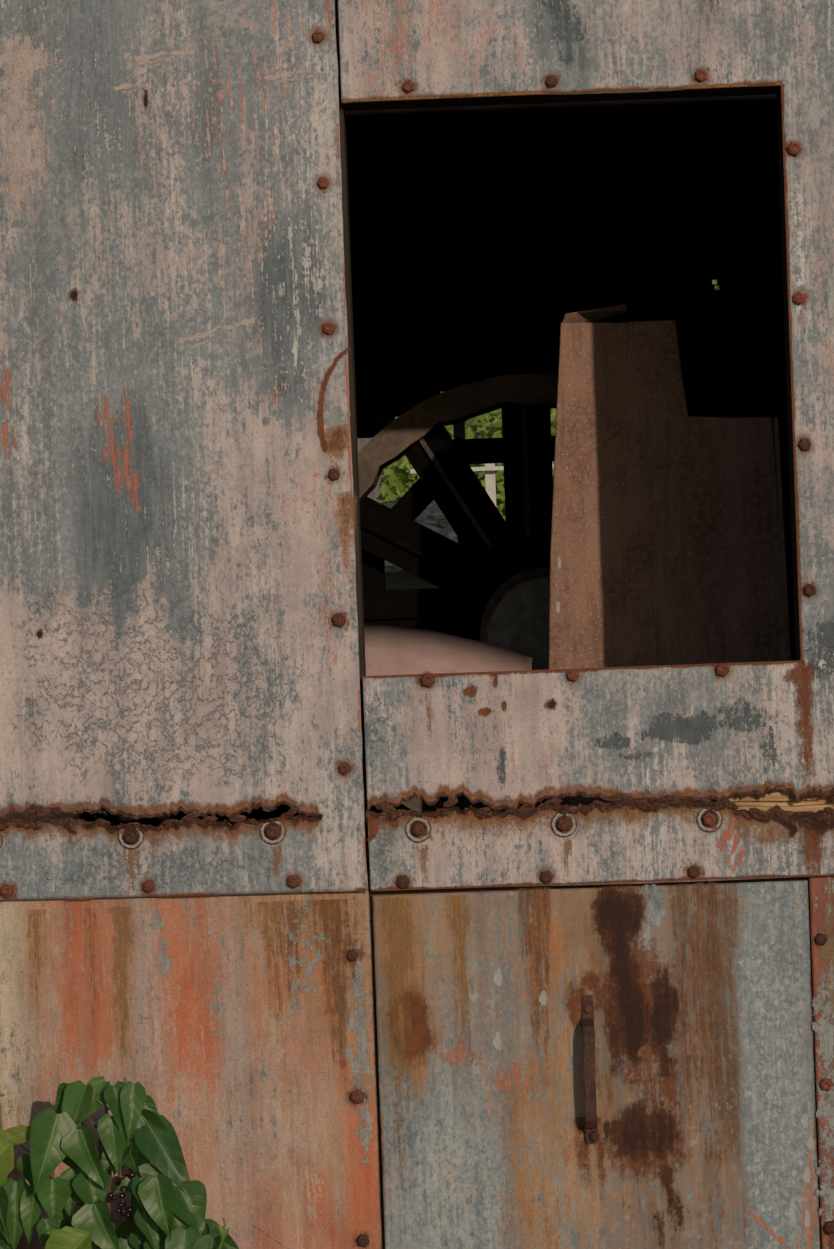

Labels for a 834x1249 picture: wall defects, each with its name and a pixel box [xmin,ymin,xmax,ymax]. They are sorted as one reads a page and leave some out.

peeling [0,32,63,222]
peeling [0,362,18,459]
peeling [96,388,140,514]
peeling [323,400,351,458]
rust [336,336,355,567]
rust [342,80,815,786]
crack [0,796,323,844]
crack [367,783,834,843]
rust [356,824,834,1249]